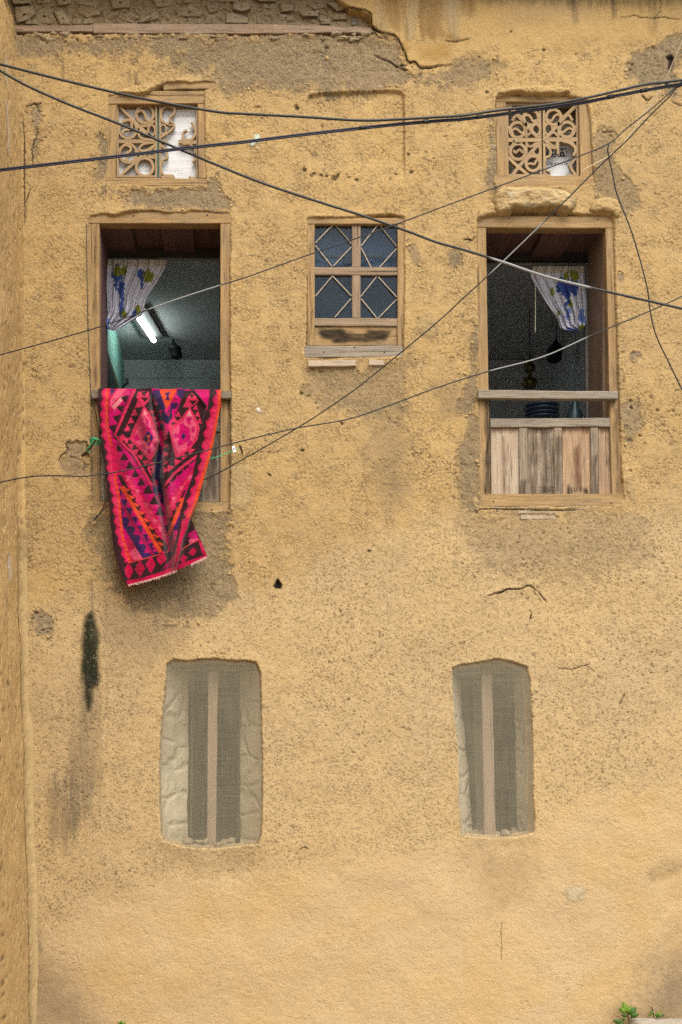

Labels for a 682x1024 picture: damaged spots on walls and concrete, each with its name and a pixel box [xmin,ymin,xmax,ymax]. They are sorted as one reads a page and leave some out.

flaking render [8,0,434,99]
crack [490,586,546,618]
damp [82,613,99,710]